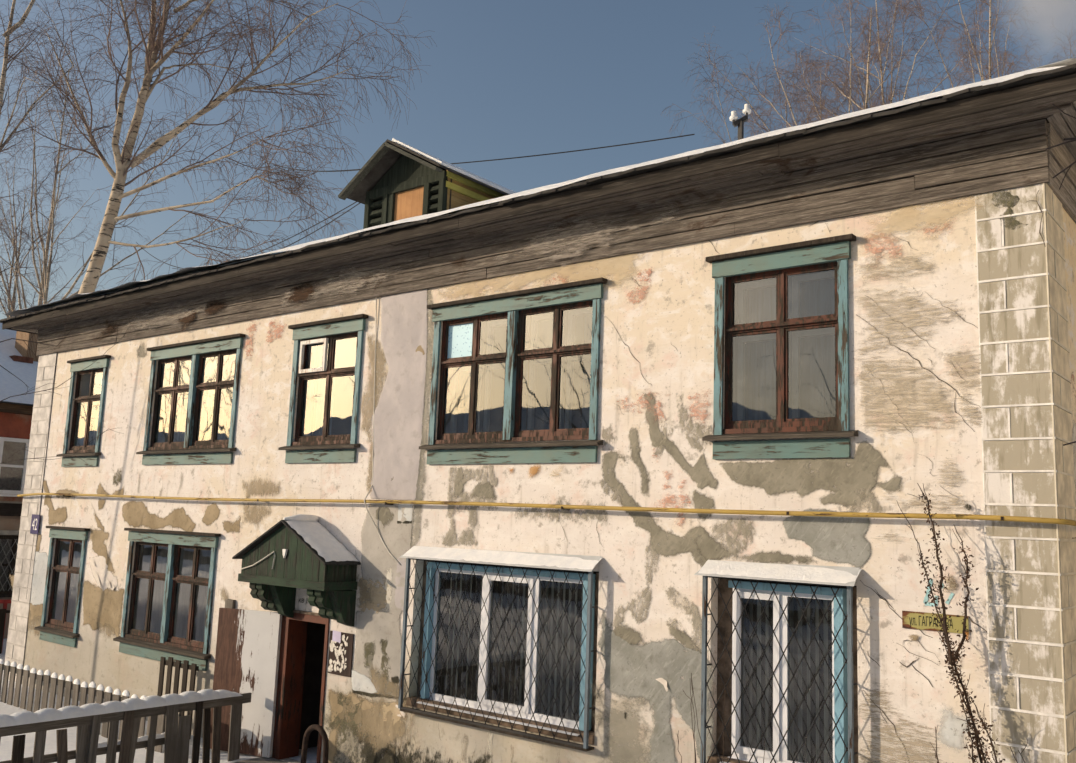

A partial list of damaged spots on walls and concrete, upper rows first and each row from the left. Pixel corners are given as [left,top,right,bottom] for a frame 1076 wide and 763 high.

peeling [858,233,982,433]
peeling [28,480,78,635]
spalling [83,470,279,637]
peeling [656,471,691,525]
damp [325,639,493,763]
damp [597,697,649,763]